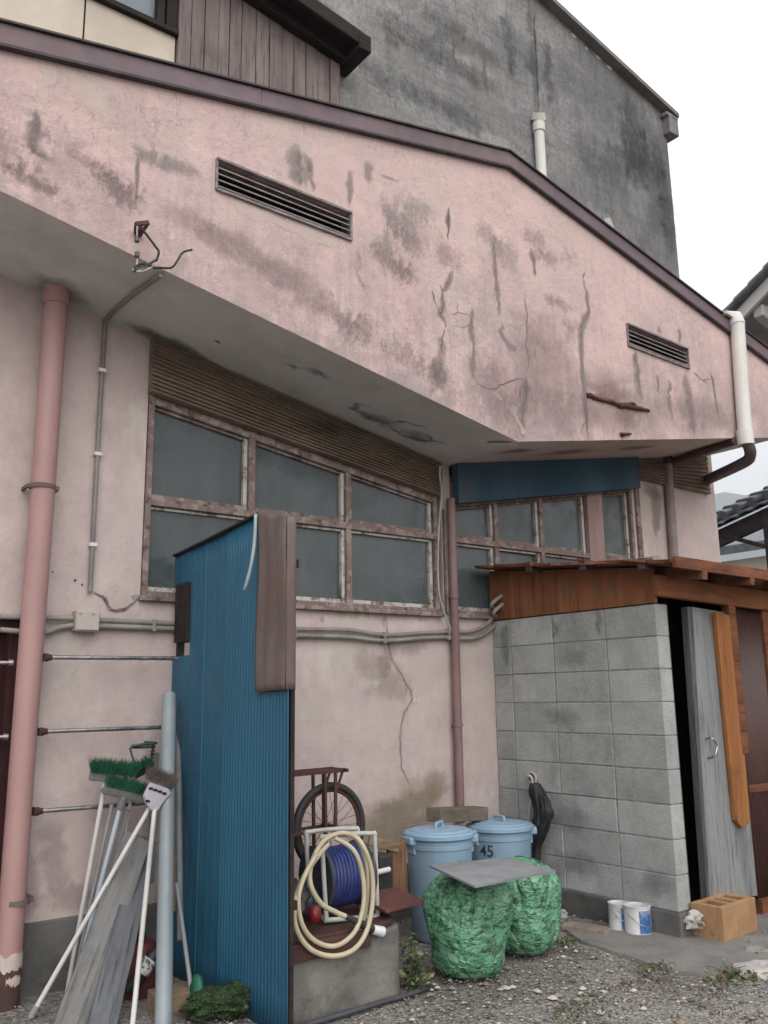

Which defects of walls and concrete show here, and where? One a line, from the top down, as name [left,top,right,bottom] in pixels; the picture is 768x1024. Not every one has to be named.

crack [433,275,529,443]
crack [579,273,590,431]
crack [387,631,413,767]